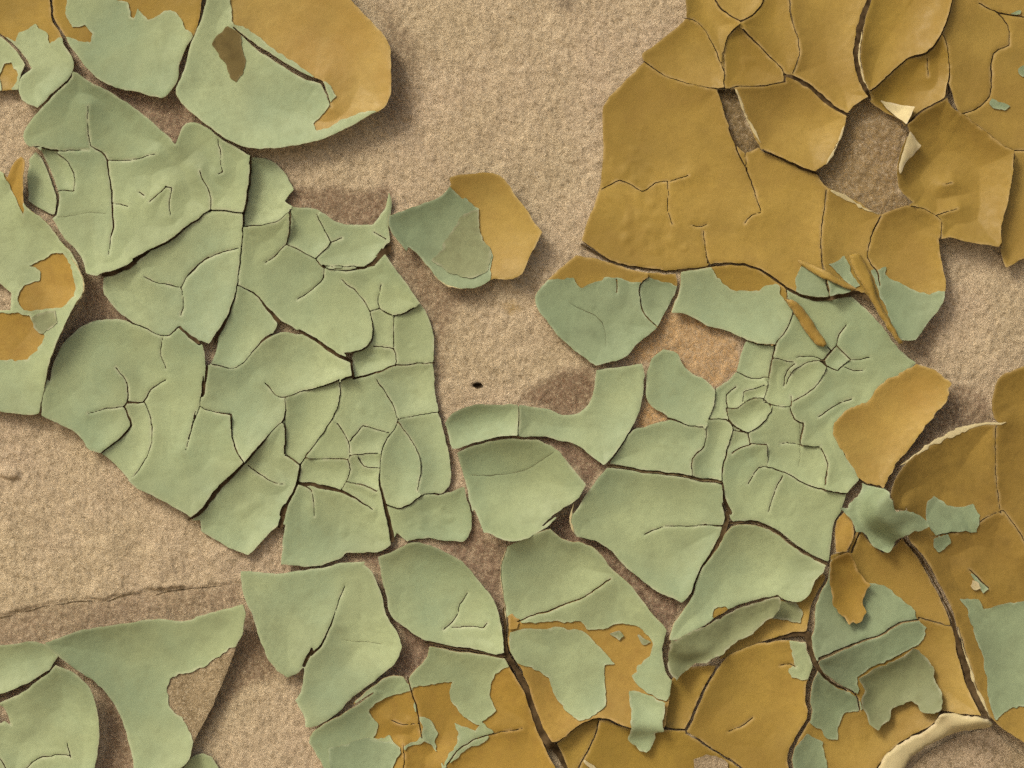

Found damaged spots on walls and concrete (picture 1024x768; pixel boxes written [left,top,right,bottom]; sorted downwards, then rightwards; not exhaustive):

crack [643,0,847,115]
crack [854,0,1024,177]
crack [35,114,440,542]
peeling [0,0,542,567]
crack [581,128,881,597]
peeling [445,0,1024,768]
crack [911,206,956,239]
crack [980,427,1024,541]
peeling [0,604,246,768]
peeling [241,562,555,768]
peeling [378,542,504,655]
crack [766,537,988,717]